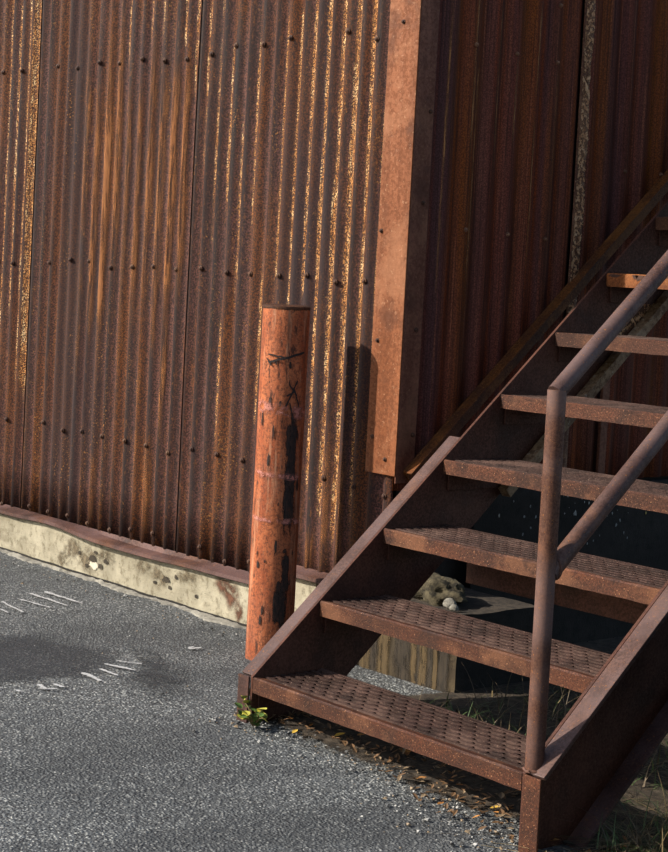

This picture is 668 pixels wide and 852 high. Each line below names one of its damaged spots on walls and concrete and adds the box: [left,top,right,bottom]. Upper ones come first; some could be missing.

corrosion [0,0,42,392]
corrosion [82,2,189,323]
corrosion [185,0,213,90]
corrosion [226,57,235,202]
corrosion [275,17,290,276]
corrosion [287,14,304,302]
corrosion [301,0,378,542]